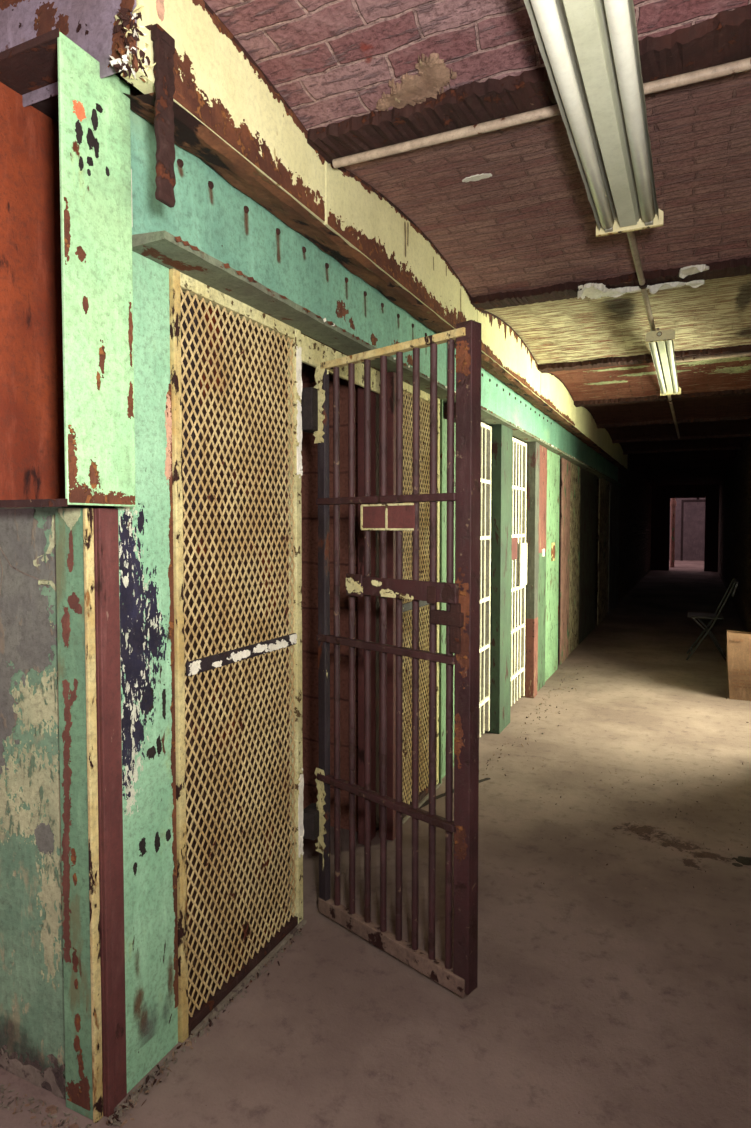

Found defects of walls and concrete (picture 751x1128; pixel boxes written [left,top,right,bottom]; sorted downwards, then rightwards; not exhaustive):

rust [0,0,69,37]
rust [108,0,135,68]
peeling [156,0,165,21]
peeling [72,100,110,176]
peeling [173,0,476,331]
flaking render [462,173,492,182]
peeling [119,503,170,816]
peeling [188,634,297,676]
peeling [0,508,80,989]
rust [61,678,79,989]
peeling [133,829,171,876]
rust [66,1013,90,1111]